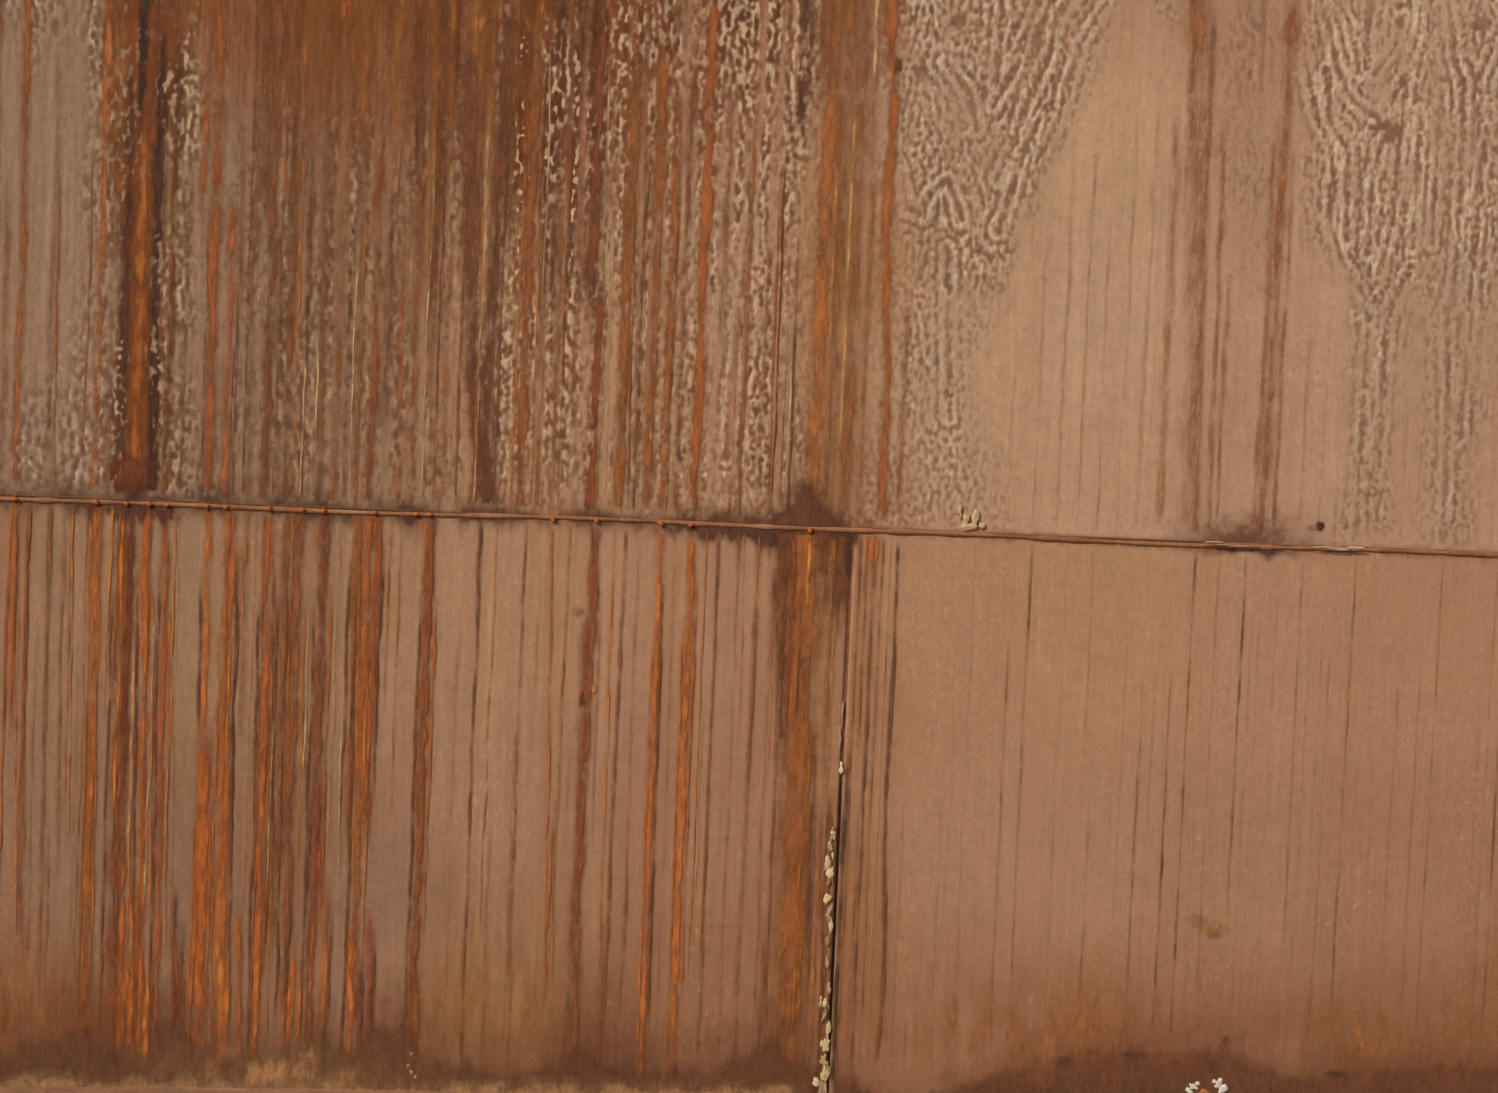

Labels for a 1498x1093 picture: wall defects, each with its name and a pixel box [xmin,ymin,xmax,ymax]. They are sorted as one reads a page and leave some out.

corrosion [0,0,908,1081]
leakage [0,766,861,1093]
leakage [946,1036,1498,1093]